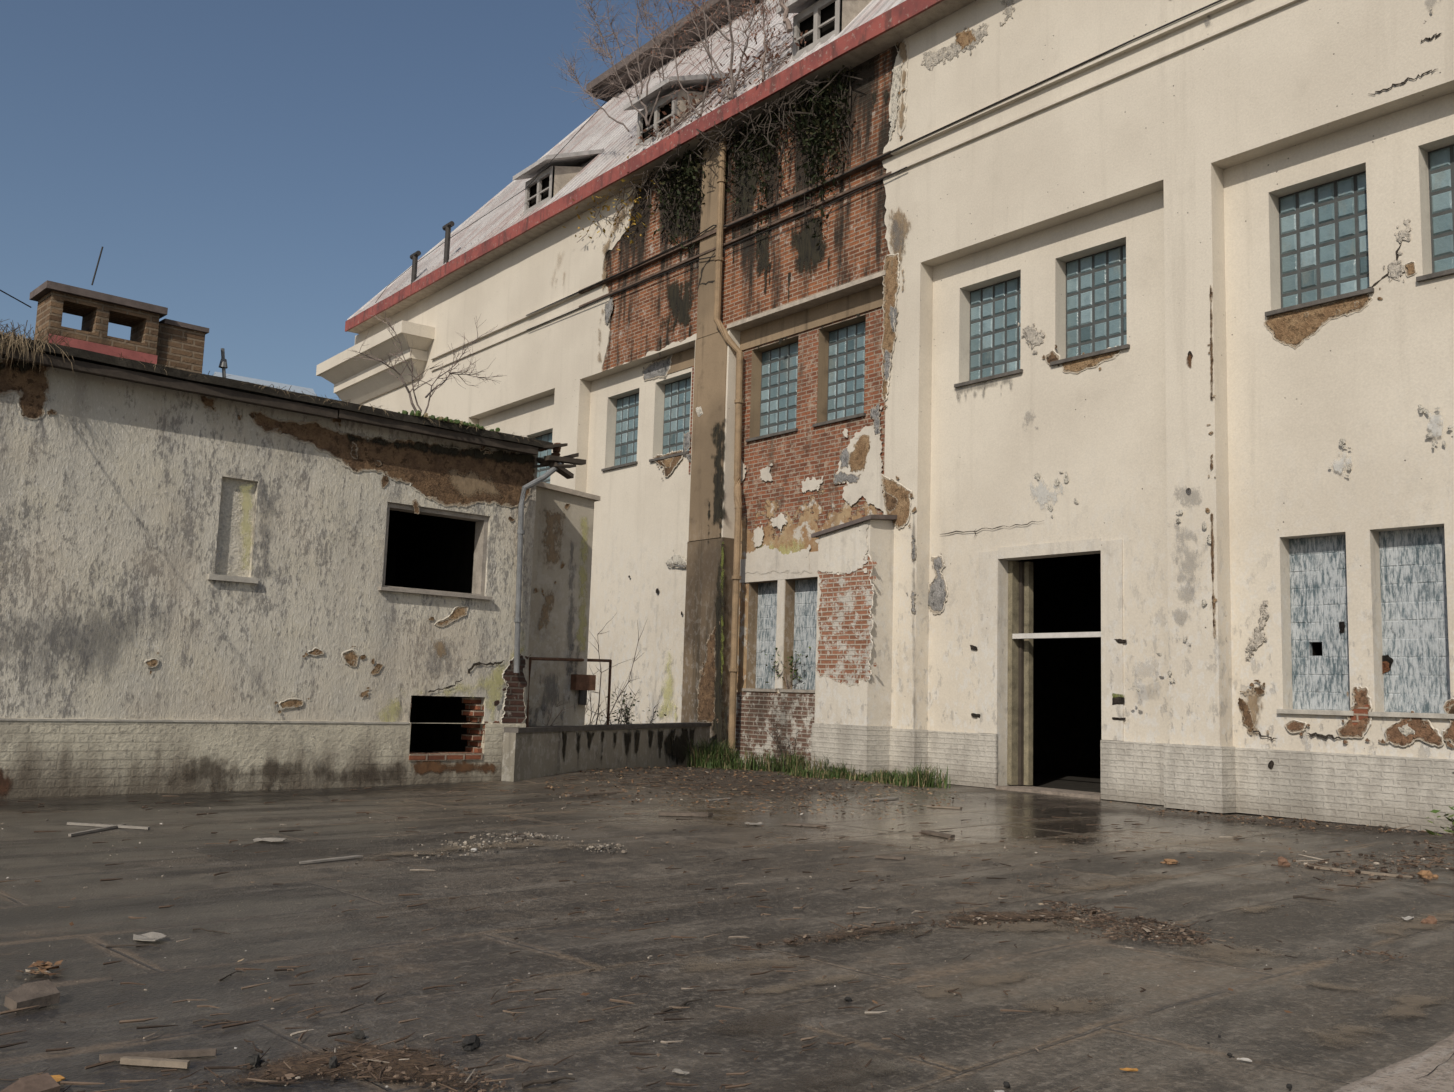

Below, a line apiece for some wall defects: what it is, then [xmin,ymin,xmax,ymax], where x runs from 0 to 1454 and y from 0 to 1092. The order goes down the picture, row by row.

crack [1372,33,1441,95]
flaking render [0,353,57,420]
flaking render [238,409,537,522]
flaking render [603,152,703,381]
leakage [659,164,694,357]
leakage [729,122,771,293]
leakage [788,55,880,301]
flaking render [721,0,1015,615]
flaking render [1264,219,1417,350]
flaking render [533,504,570,630]
flaking render [745,513,877,687]
flaking render [1336,686,1454,749]